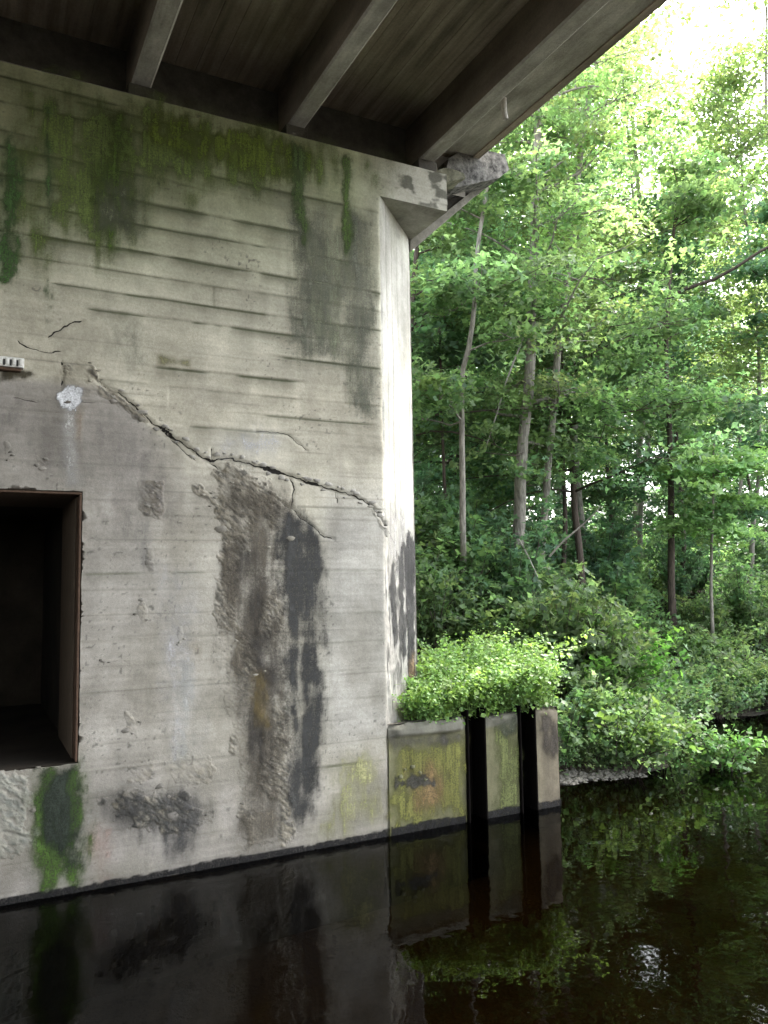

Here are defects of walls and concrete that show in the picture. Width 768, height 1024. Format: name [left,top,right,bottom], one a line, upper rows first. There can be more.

water stain [0,138,24,284]
water stain [146,112,375,413]
crack [18,321,81,386]
peeling [60,360,150,424]
crack [81,381,397,553]
water stain [0,483,466,906]
spalling [97,783,215,838]
water stain [488,806,520,819]
water stain [539,799,561,810]